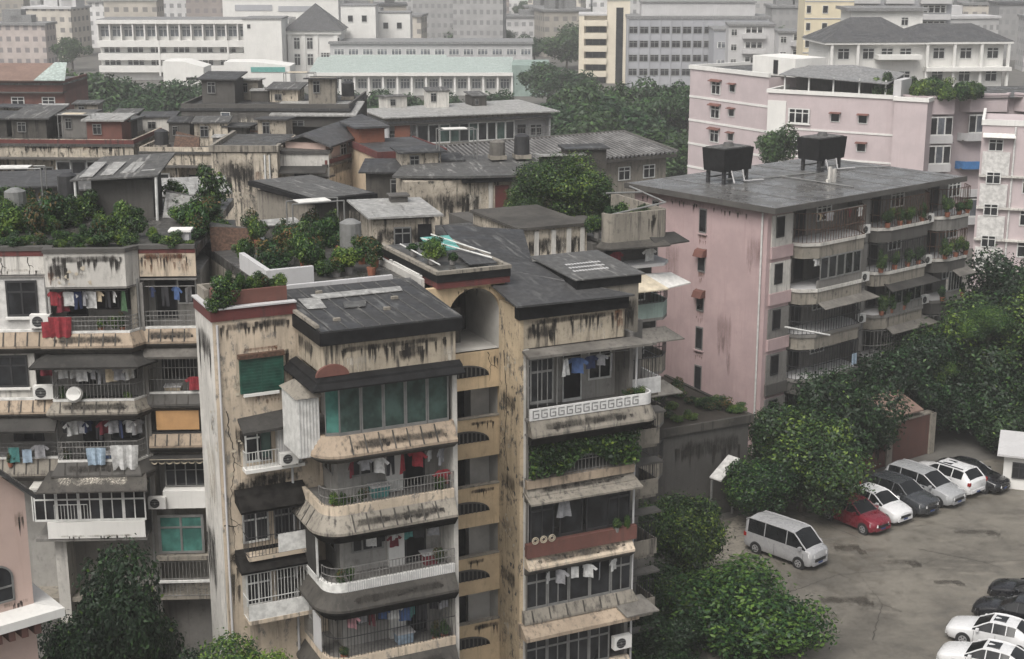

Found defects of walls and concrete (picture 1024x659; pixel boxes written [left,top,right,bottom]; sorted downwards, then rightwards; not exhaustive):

water stain [424,195,481,215]
water stain [29,256,121,282]
water stain [141,255,187,267]
water stain [220,319,289,337]
water stain [528,300,635,342]
water stain [341,337,453,365]
crack [224,411,242,601]